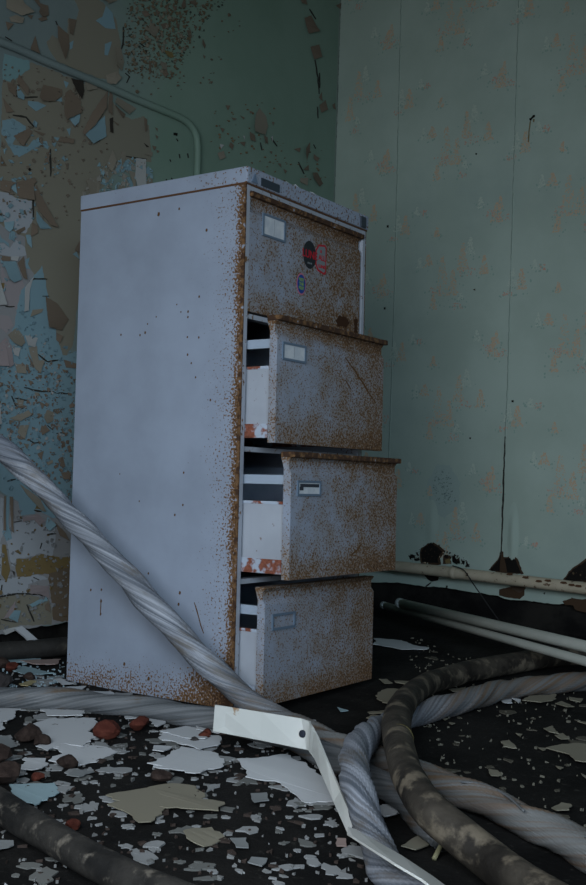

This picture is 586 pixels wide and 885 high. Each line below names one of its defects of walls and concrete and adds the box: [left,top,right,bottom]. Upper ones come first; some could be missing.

flaking render [0,0,213,497]
flaking render [0,588,53,635]